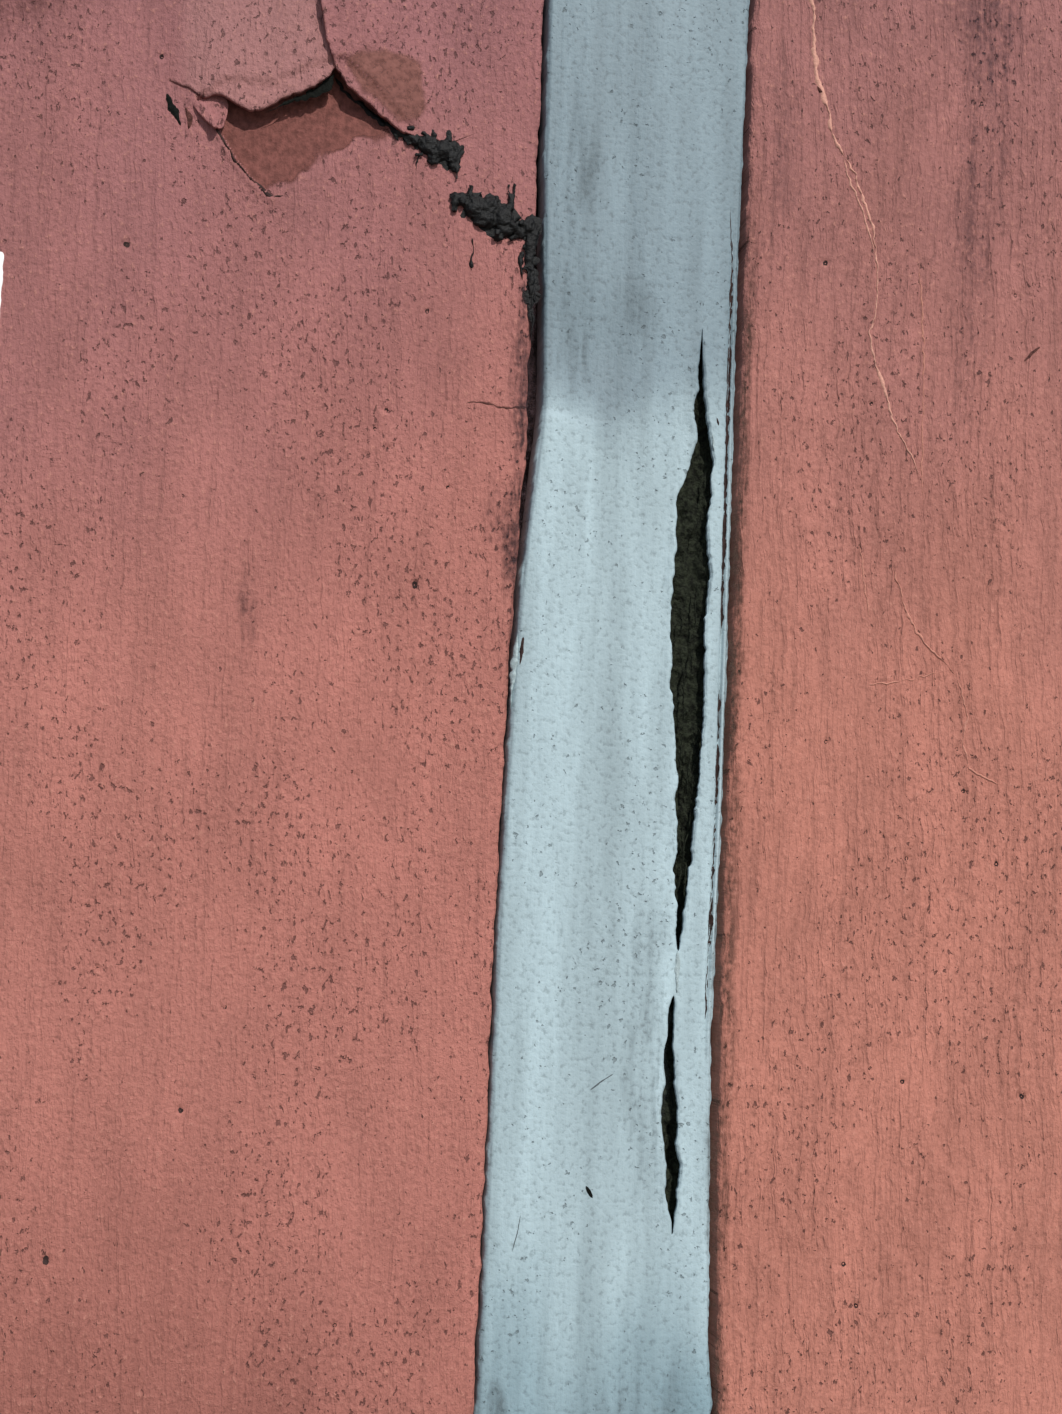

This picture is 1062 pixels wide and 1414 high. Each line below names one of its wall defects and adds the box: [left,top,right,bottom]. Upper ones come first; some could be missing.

flaking render [166,0,481,197]
crack [808,0,925,494]
crack [720,213,734,628]
crack [859,545,997,784]
crack [705,680,721,1018]